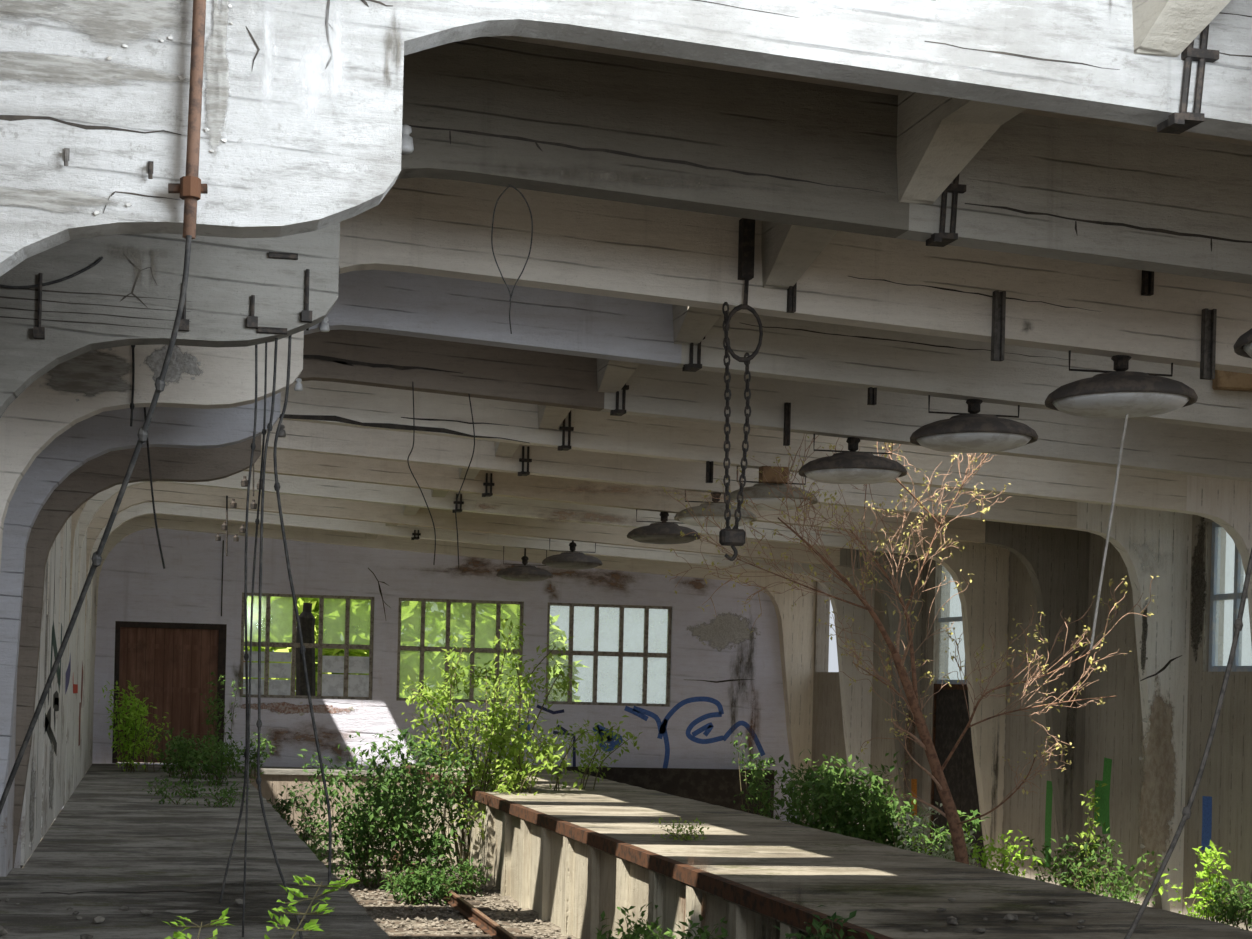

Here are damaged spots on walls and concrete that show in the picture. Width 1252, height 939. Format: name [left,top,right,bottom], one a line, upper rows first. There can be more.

spalling [0,0,182,48]
flaking render [204,0,233,154]
crack [0,115,181,135]
crack [965,203,1252,252]
peeling [1139,603,1176,885]